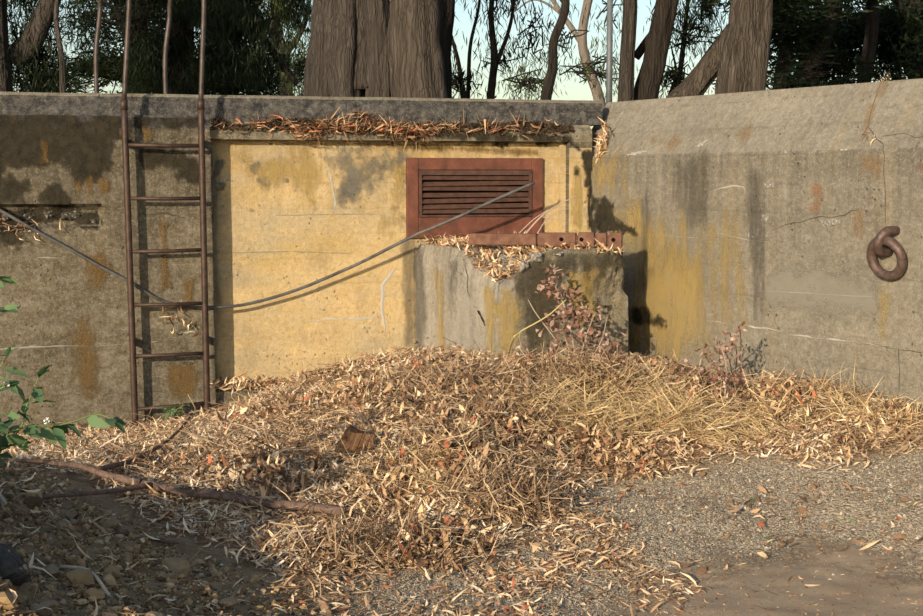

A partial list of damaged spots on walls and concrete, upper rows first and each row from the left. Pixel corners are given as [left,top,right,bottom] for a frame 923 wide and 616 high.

spalling [23,211,97,224]
water stain [337,150,407,203]
crack [587,170,691,239]
crack [718,210,855,242]
crack [862,79,923,224]
spalling [519,252,563,274]
water stain [615,201,705,366]
crack [631,320,920,385]